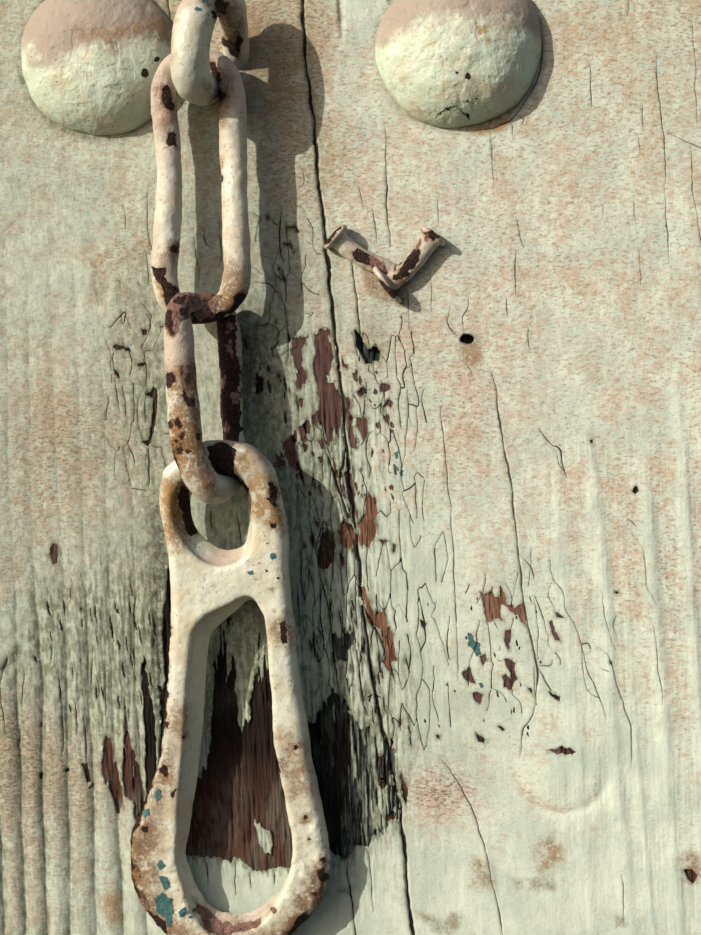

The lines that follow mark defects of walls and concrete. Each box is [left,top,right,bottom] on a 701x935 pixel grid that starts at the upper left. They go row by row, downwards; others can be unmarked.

corrosion [352,229,440,304]
peeling [143,381,161,449]
peeling [250,327,397,569]
crack [252,0,632,935]
peeling [109,584,163,723]
peeling [329,583,408,681]
peeling [459,667,483,705]
peeling [471,586,537,698]
peeling [549,607,564,641]
peeling [99,696,145,820]
peeling [186,615,293,874]
peeling [378,754,408,825]